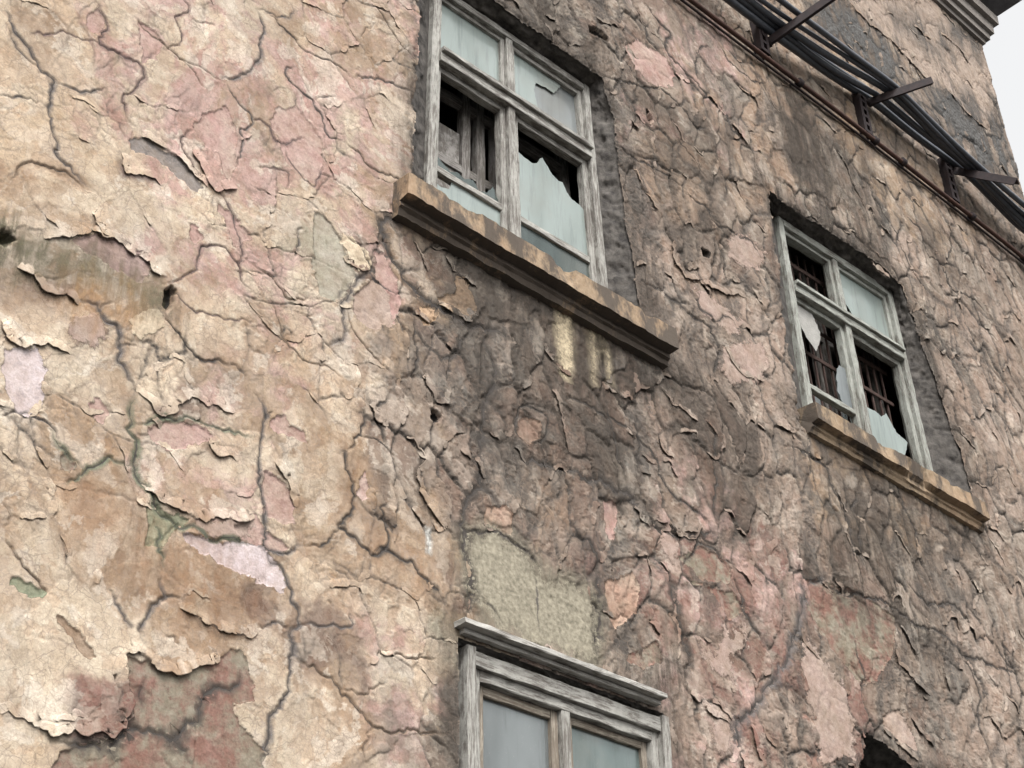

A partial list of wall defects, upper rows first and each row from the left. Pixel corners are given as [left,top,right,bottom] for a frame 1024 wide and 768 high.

crack [8,4,399,187]
peeling [121,105,338,248]
peeling [0,262,109,418]
crack [169,198,244,363]
crack [266,213,539,622]
peeling [0,584,266,768]
peeling [136,459,300,594]
crack [18,304,439,757]
crack [514,398,730,676]
peeling [591,500,756,692]
crack [733,493,1019,749]
peeling [784,546,999,768]